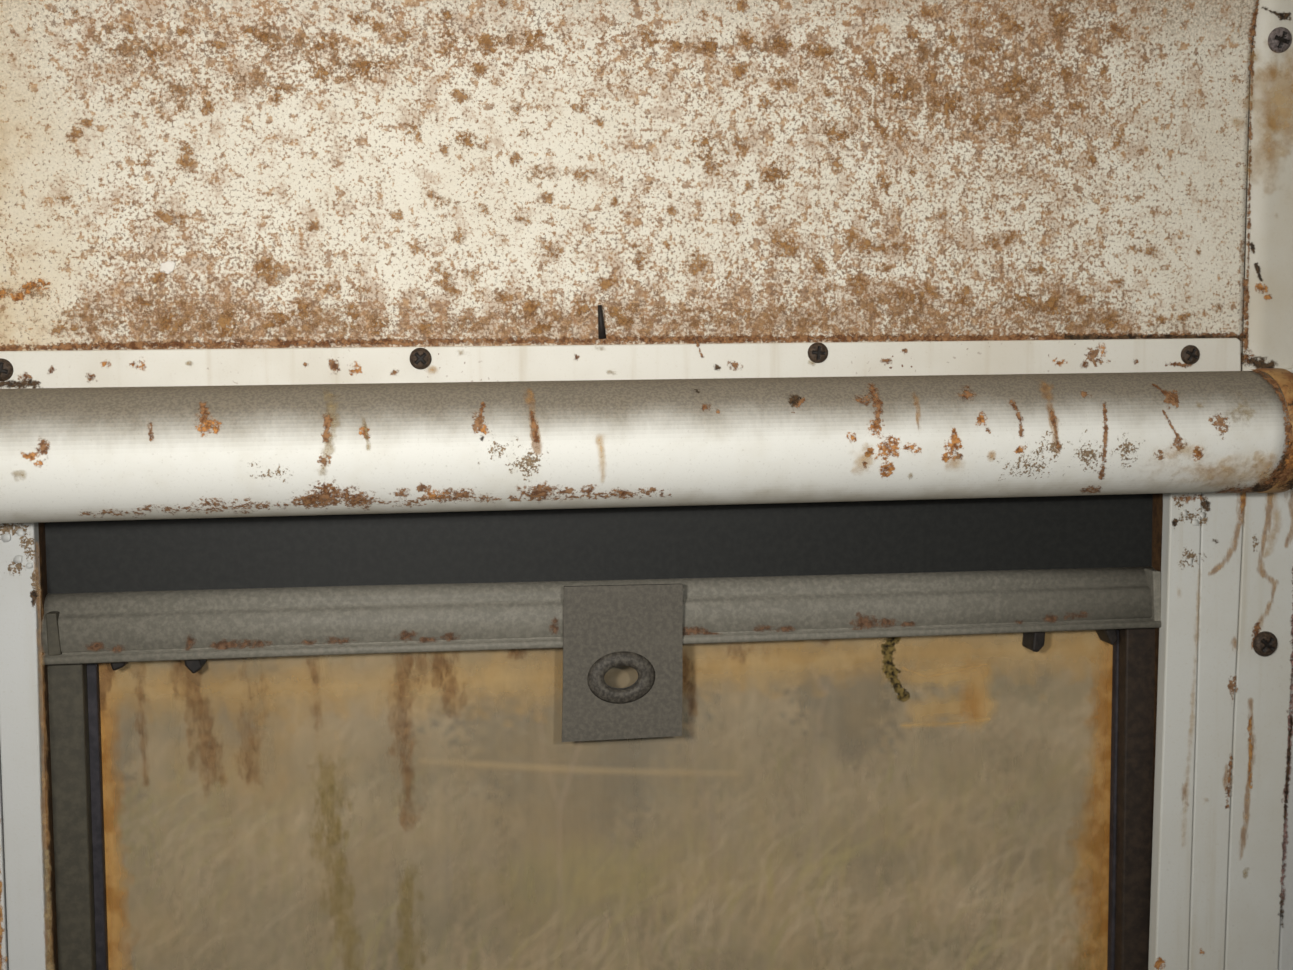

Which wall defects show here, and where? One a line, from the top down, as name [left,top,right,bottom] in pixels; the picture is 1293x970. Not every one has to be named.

rust [81,16,401,116]
rust [351,11,549,77]
rust [451,89,469,104]
rust [638,29,851,61]
rust [818,11,1082,172]
rust [440,132,487,156]
rust [510,153,596,204]
rust [689,134,748,176]
rust [745,161,790,191]
rust [0,229,1293,573]
rust [1224,700,1253,842]
rust [1278,603,1293,928]